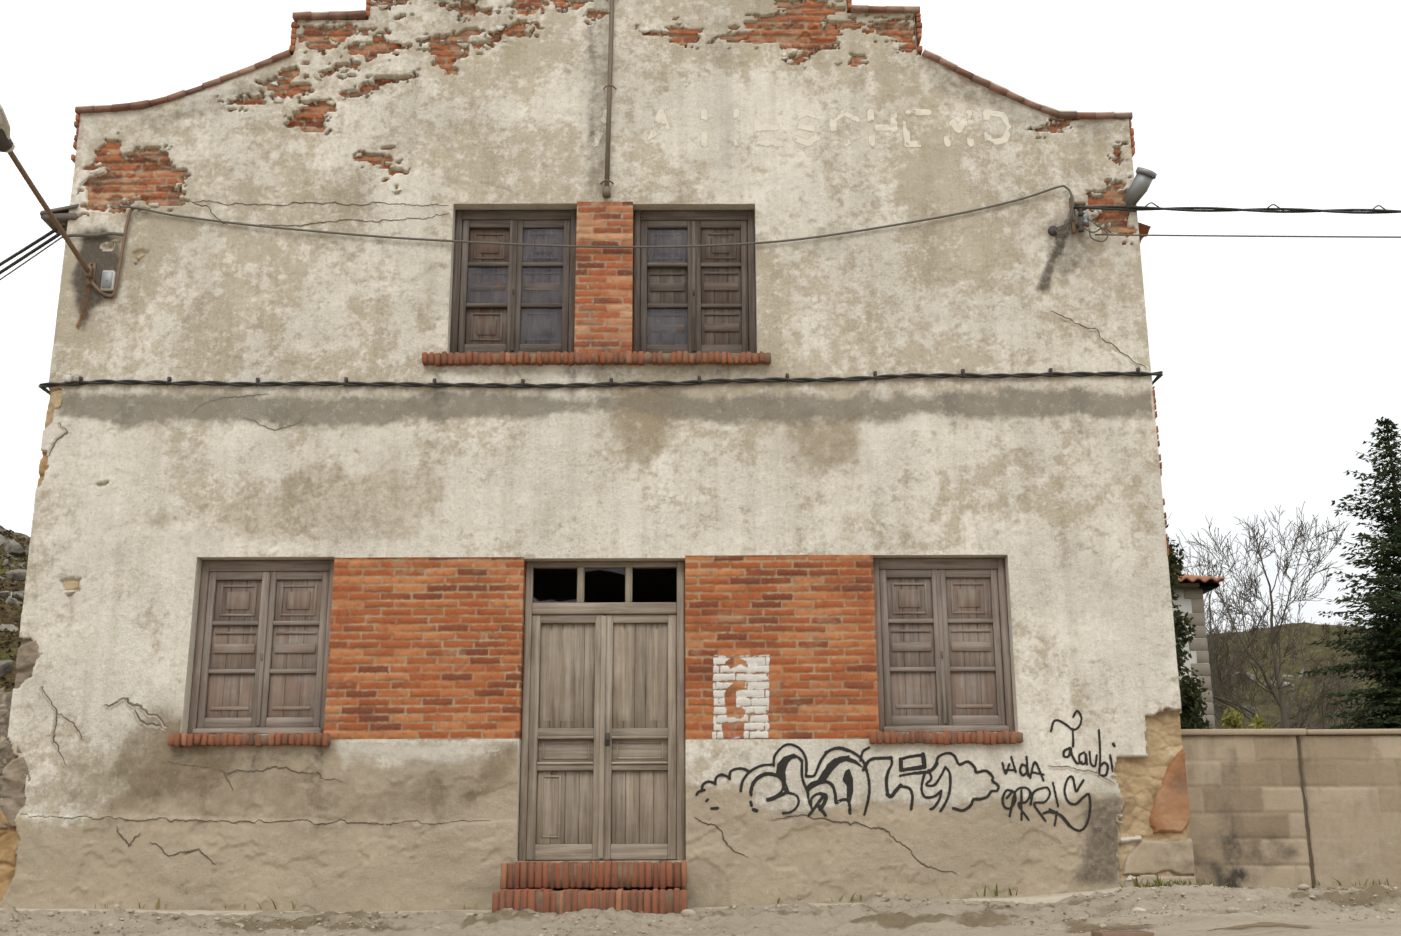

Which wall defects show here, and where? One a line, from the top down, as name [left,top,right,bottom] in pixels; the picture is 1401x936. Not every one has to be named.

spalling [222,0,609,133]
spalling [639,0,917,73]
spalling [78,133,190,217]
spalling [353,148,408,195]
spalling [1085,143,1136,245]
flaking render [0,738,31,902]
crack [24,686,488,865]
crack [695,817,747,857]
crack [774,814,957,874]
flaking render [1111,706,1195,881]